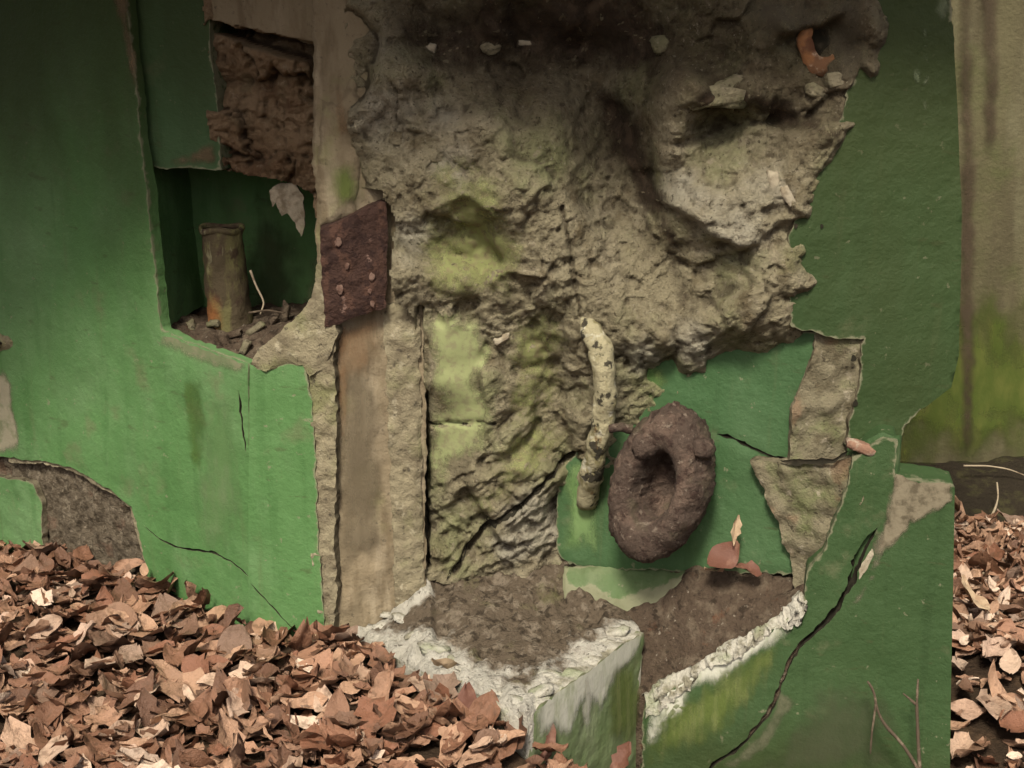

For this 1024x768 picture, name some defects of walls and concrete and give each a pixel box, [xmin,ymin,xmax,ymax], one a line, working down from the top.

spalling [202,0,317,218]
water stain [984,0,997,136]
spalling [344,0,889,588]
water stain [961,30,974,440]
spalling [0,374,148,576]
crack [146,527,297,630]
crack [238,395,246,450]
crack [709,528,884,768]